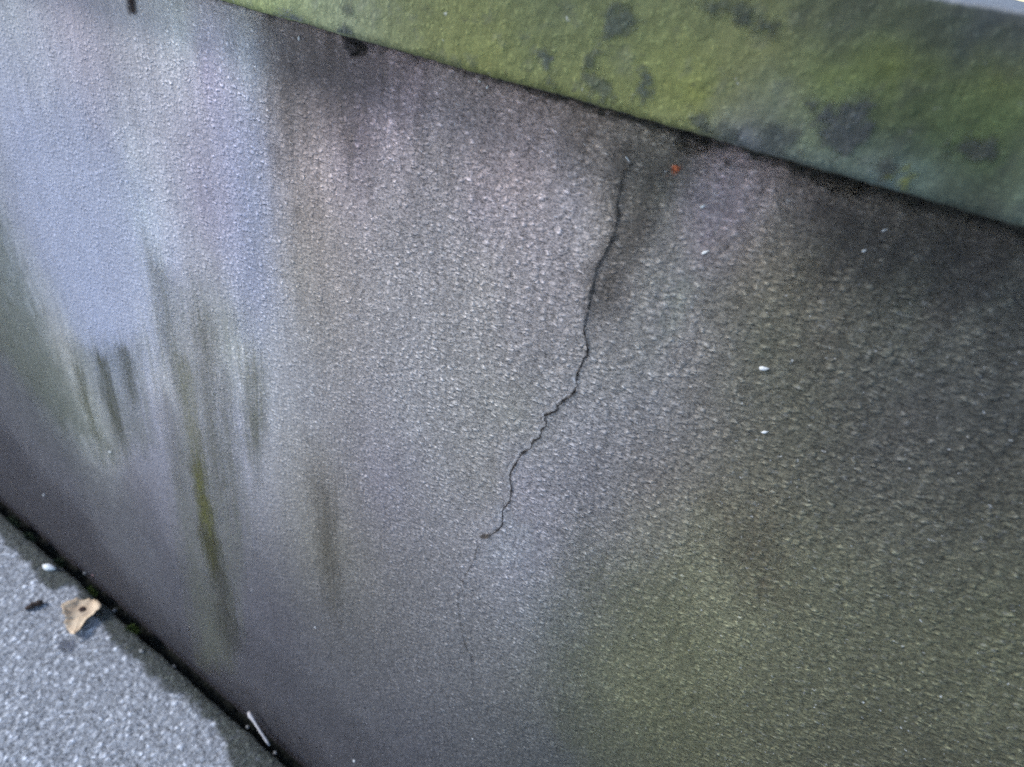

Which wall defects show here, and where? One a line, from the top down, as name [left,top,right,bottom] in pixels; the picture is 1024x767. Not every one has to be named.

leakage [22,132,155,381]
crack [457,325,589,698]
leakage [0,513,286,767]